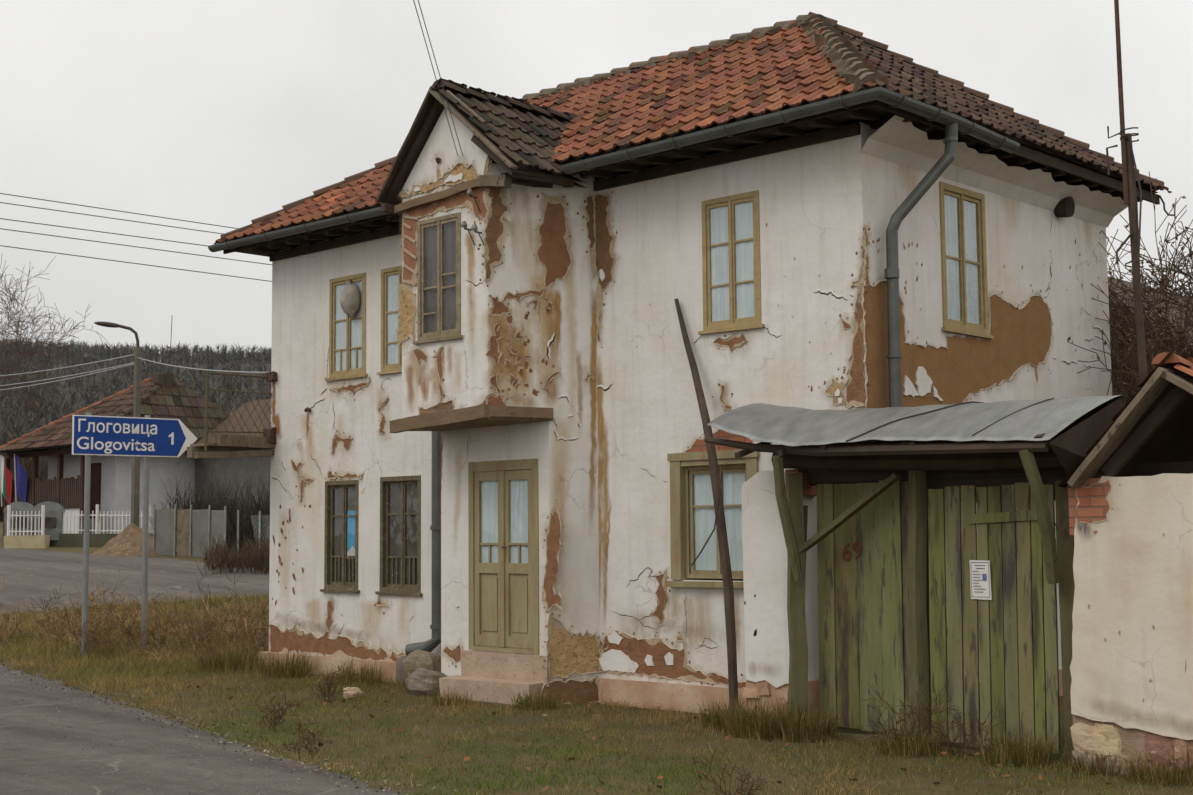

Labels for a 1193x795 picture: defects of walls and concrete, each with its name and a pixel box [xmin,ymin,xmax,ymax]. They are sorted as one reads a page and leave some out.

spalling [395,156,618,415]
spalling [714,330,748,352]
spalling [808,224,1053,409]
spalling [272,459,364,605]
spalling [266,598,406,662]
spalling [331,430,353,455]
spalling [540,499,746,704]
flaking render [1069,480,1120,534]